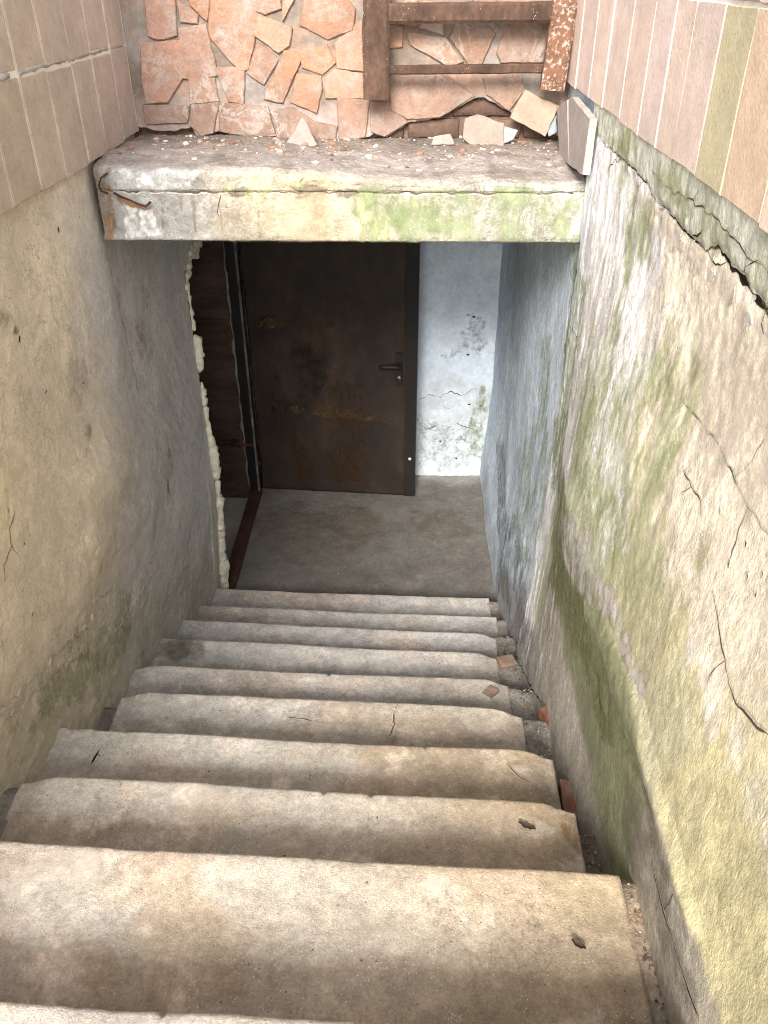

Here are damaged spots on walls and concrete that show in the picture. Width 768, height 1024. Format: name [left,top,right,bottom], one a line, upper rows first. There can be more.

rust [107,188,149,241]
crack [601,138,768,335]
crack [421,388,479,434]
crack [679,397,768,559]
crack [707,590,768,735]